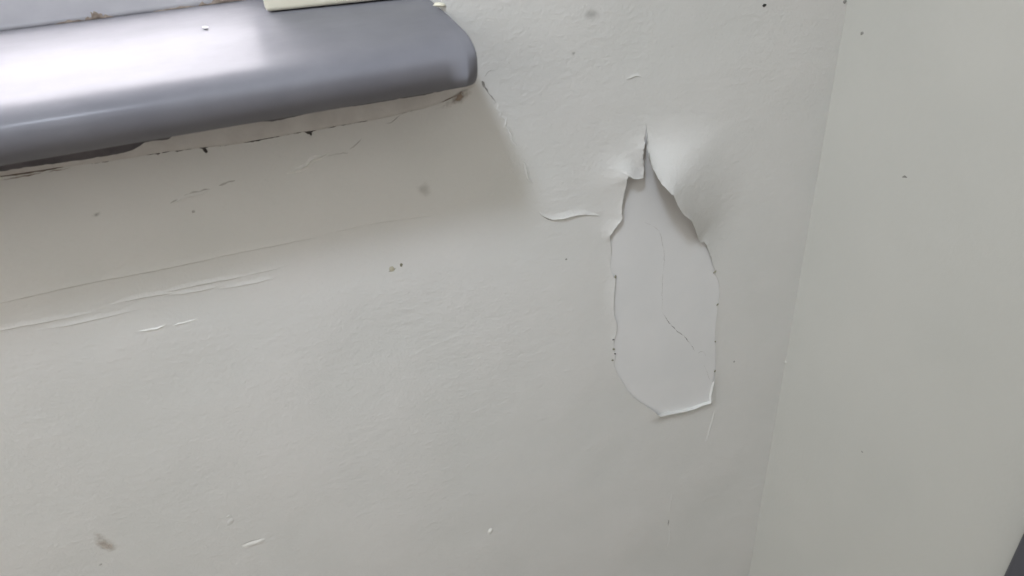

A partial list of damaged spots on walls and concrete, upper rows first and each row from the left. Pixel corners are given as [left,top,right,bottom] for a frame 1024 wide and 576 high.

crack [0,167,67,180]
peeling [520,112,792,471]